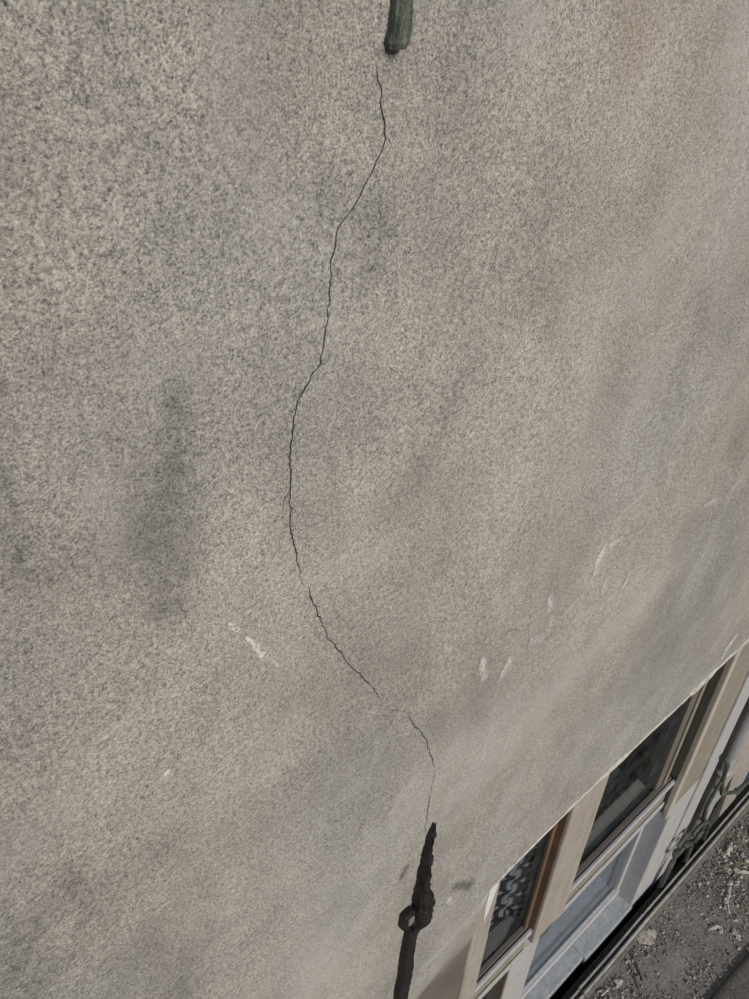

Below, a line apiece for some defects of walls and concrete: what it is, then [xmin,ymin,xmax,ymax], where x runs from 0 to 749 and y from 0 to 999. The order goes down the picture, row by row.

crack [283,63,436,834]